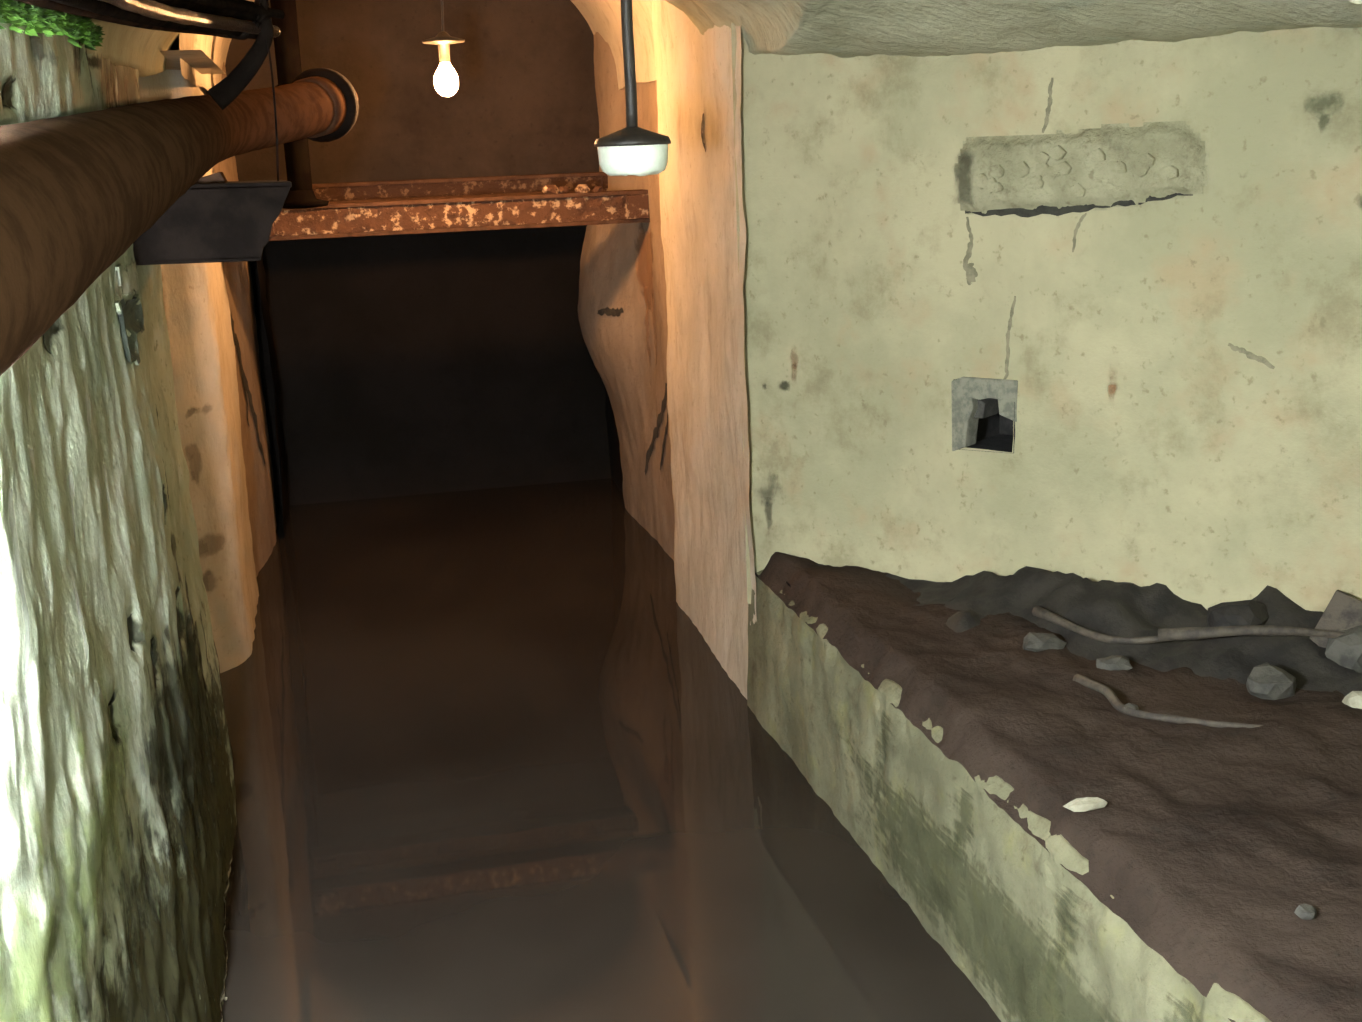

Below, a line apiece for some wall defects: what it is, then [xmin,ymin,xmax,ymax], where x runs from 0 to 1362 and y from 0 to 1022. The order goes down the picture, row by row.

spalling [954,121,1209,218]
leakage [6,712,29,785]
leakage [74,534,238,1022]
leakage [28,809,43,870]